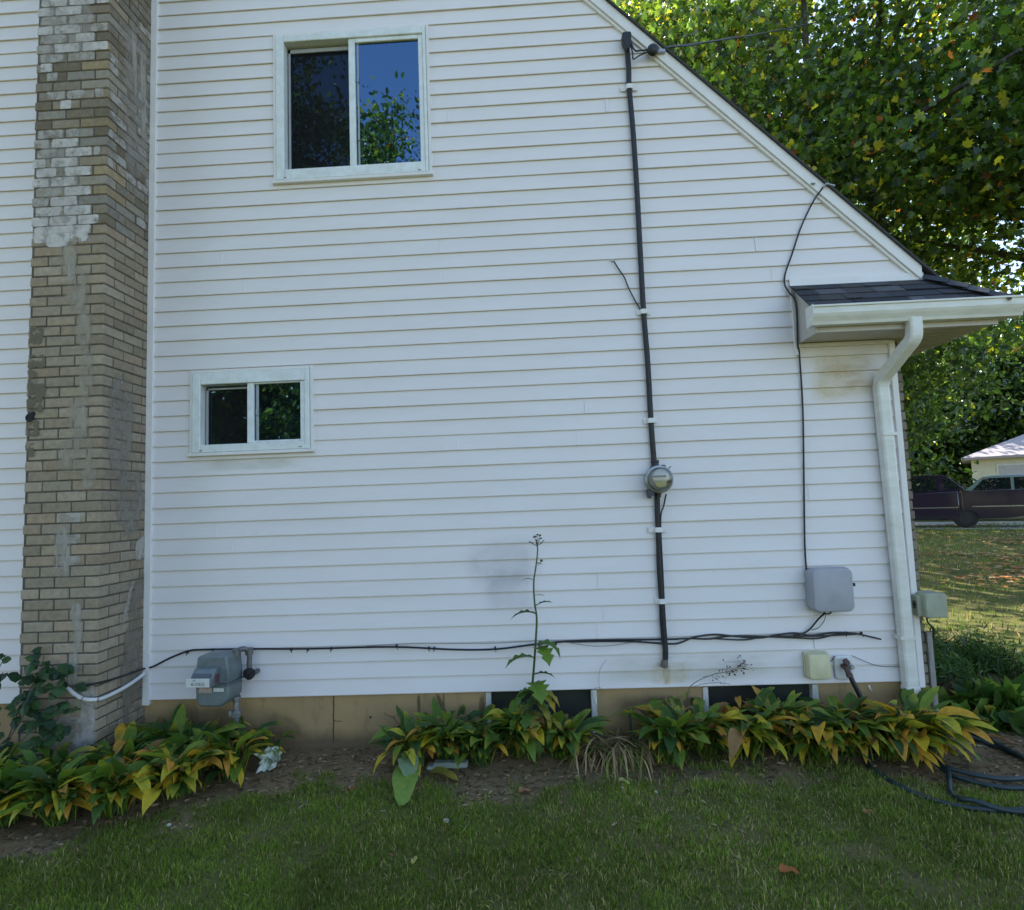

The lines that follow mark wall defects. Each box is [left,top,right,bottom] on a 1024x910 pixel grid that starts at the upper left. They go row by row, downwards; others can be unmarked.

water stain [31,0,151,488]